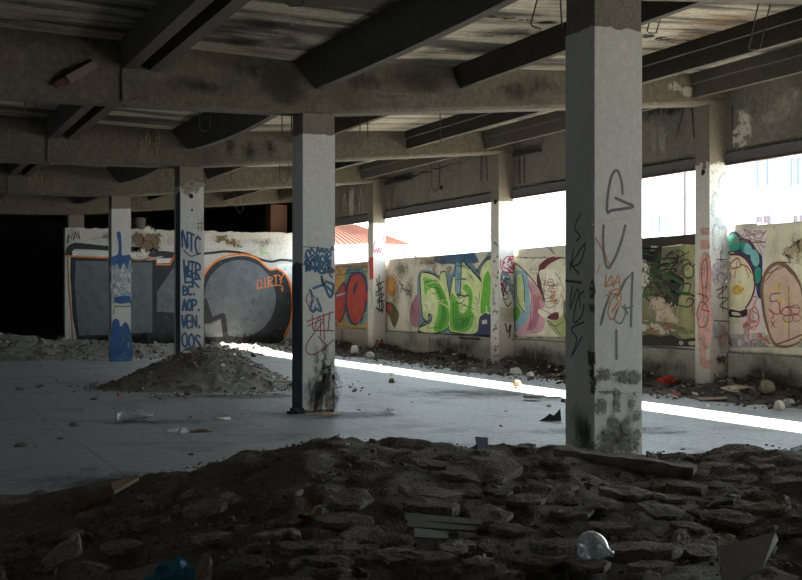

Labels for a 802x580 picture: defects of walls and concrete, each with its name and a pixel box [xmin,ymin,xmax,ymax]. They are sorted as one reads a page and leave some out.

spalling [667,76,694,138]
peeling [731,105,752,151]
peeling [181,179,206,199]
damp [309,353,338,412]